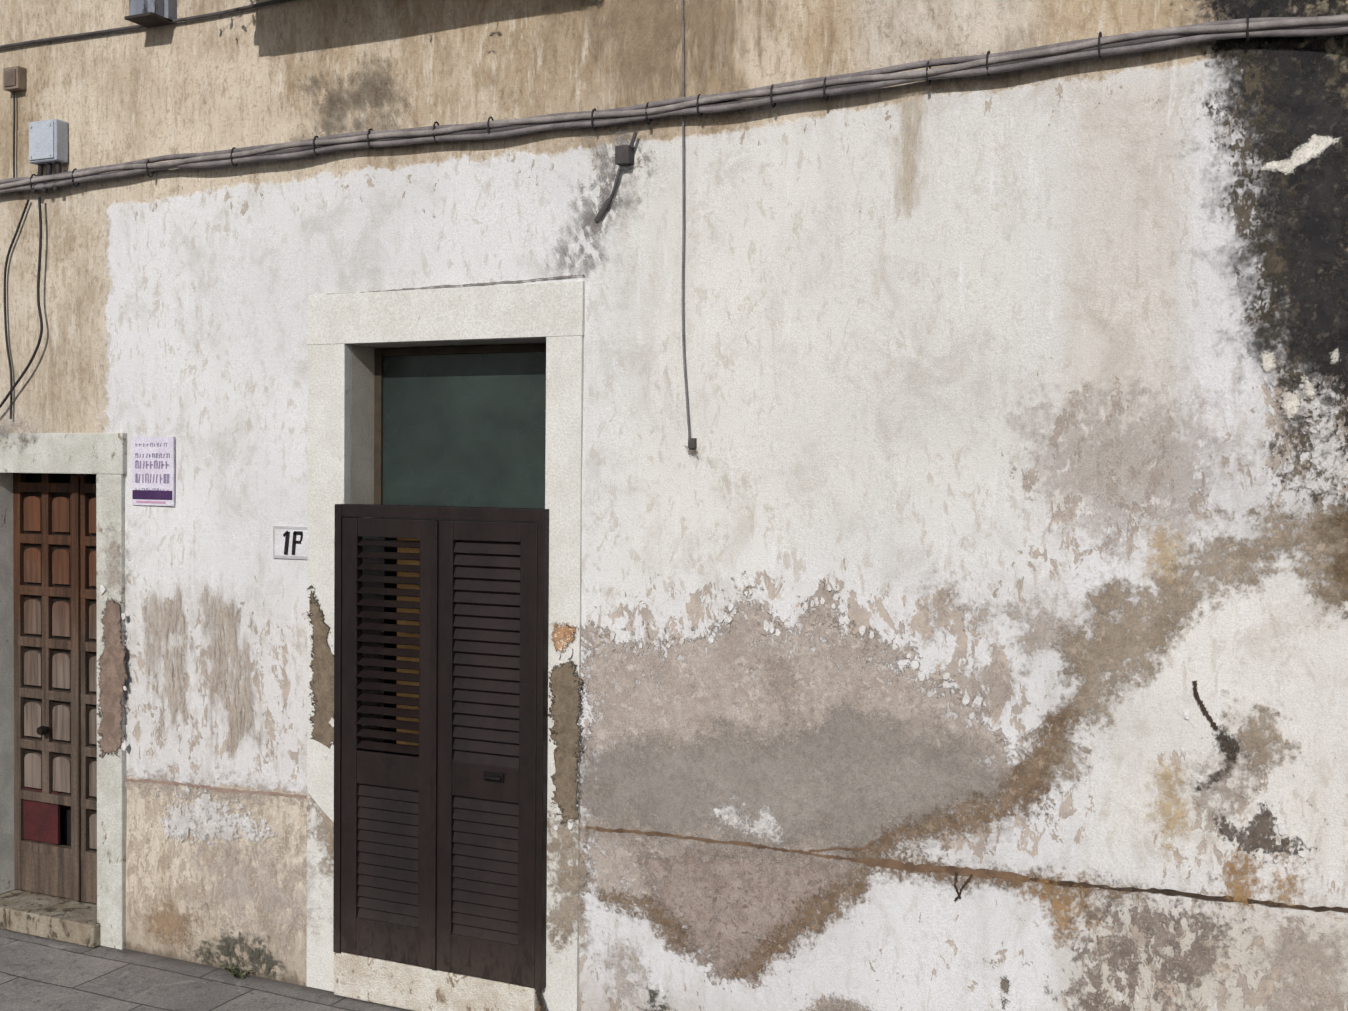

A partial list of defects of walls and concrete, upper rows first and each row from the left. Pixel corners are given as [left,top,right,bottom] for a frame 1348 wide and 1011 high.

damp [1202,0,1348,20]
damp [306,71,405,135]
damp [866,34,1348,859]
spalling [96,526,129,758]
spalling [307,584,334,760]
peeling [546,571,1076,992]
crack [581,815,1348,913]